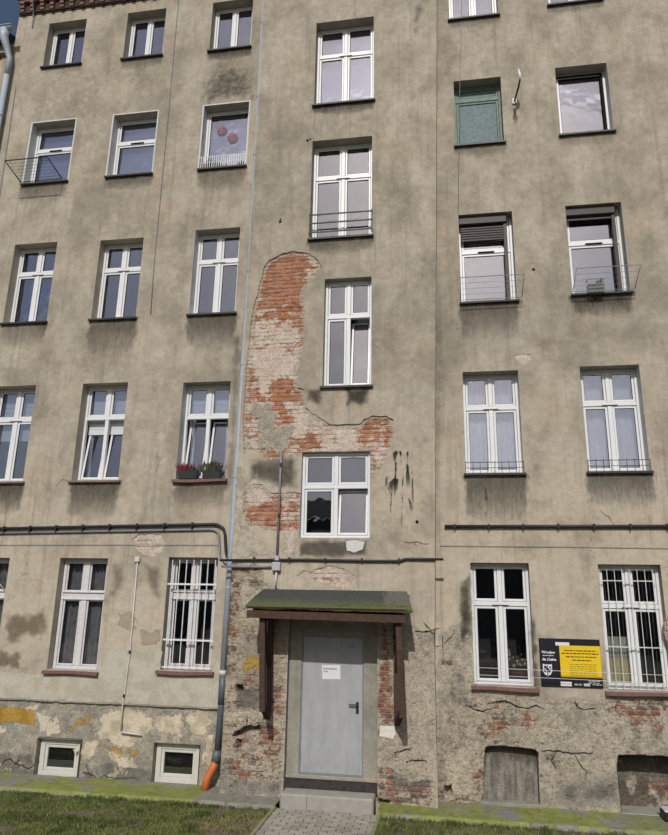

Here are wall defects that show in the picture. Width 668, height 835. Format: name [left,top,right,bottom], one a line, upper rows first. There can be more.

flaking render [243,252,394,484]
leakage [386,451,413,494]
flaking render [233,466,301,558]
flaking render [132,534,165,556]
flaking render [309,565,356,589]
leakage [8,614,44,641]
leakage [0,653,19,667]
peeling [242,655,259,673]
peeling [0,705,90,736]
crack [467,700,545,712]
flaking render [73,708,214,768]
crack [542,750,591,781]